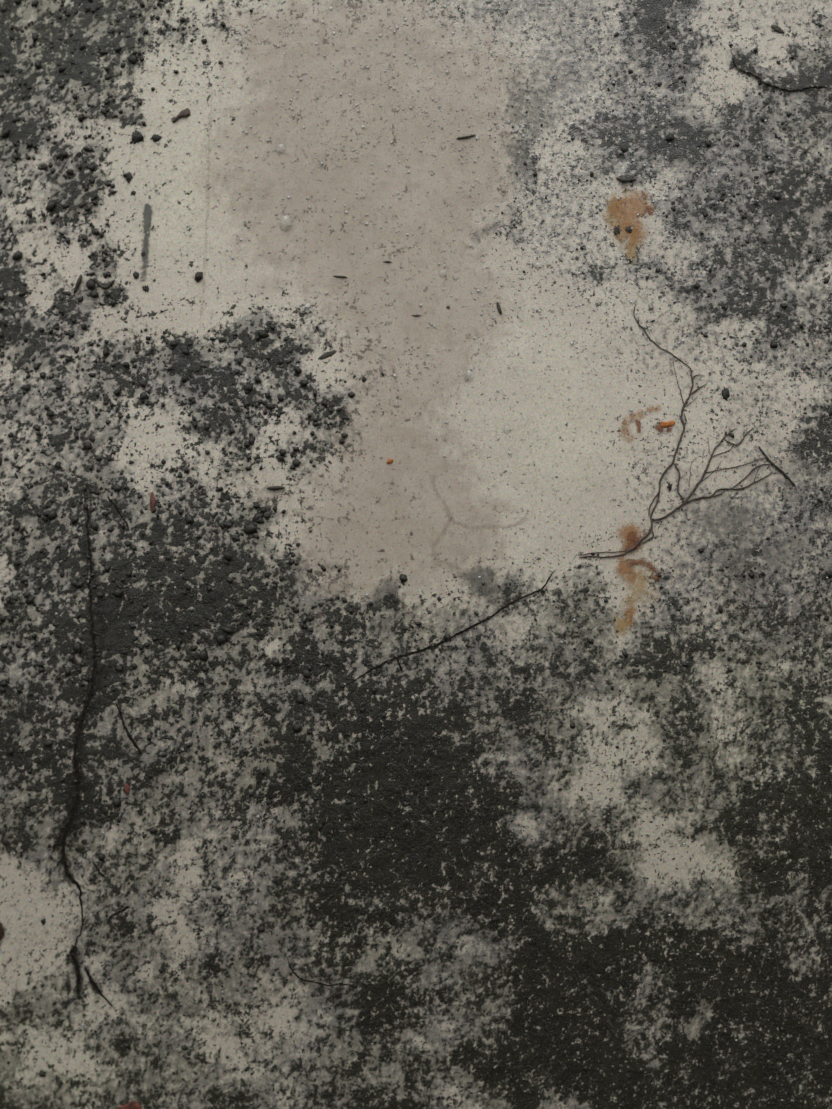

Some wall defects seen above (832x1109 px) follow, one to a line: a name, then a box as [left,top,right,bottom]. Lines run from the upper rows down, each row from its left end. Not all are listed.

leakage [0,0,159,237]
corrosion [606,191,654,259]
corrosion [622,405,676,438]
leakage [506,0,832,811]
leakage [0,204,355,987]
crack [345,570,556,686]
corrosion [617,525,659,635]
crack [53,495,142,1007]
mould [0,587,832,1109]